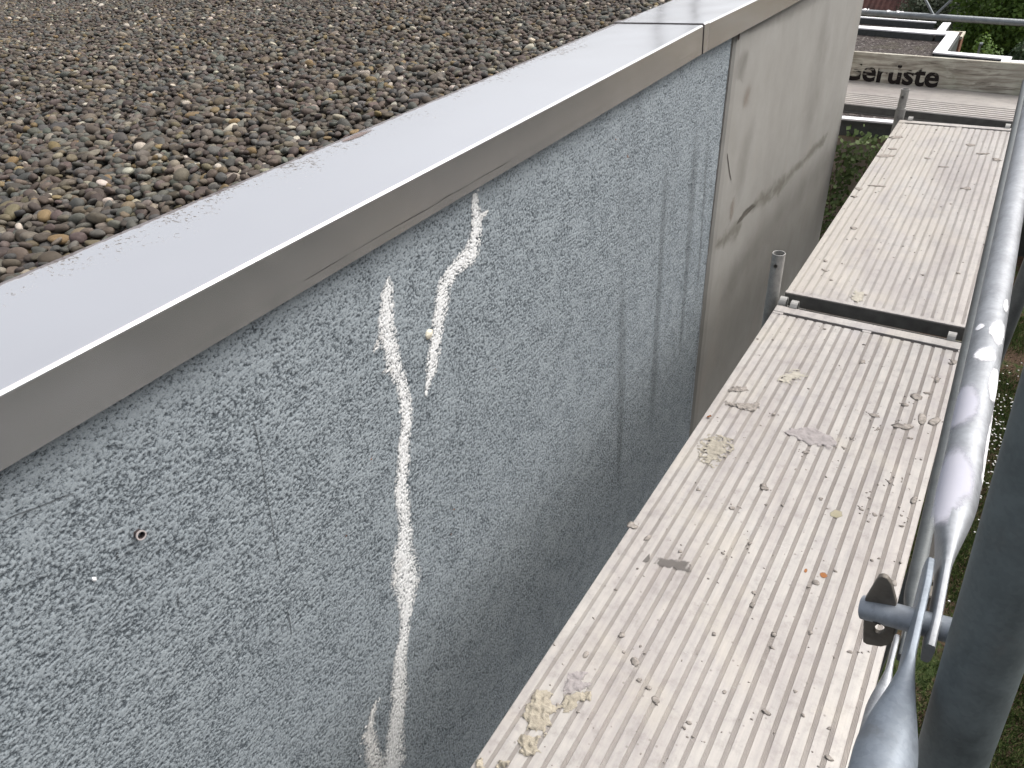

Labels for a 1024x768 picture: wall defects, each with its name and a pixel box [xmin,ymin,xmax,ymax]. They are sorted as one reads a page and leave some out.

crack [360,189,489,768]